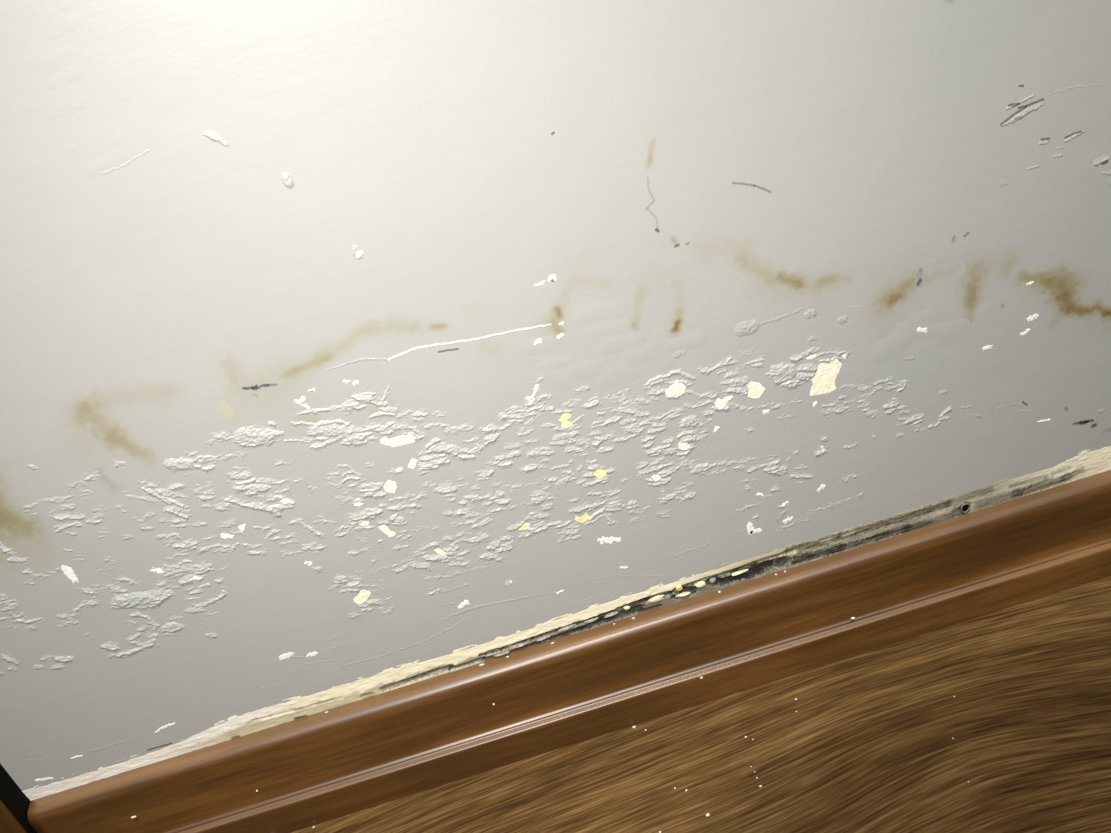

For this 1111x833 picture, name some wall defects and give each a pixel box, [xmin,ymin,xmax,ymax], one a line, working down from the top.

spalling [1000,83,1107,127]
spalling [1038,130,1085,158]
leakage [526,221,1111,353]
leakage [45,292,493,496]
leakage [0,440,103,602]
peeling [0,335,983,660]
flaking render [922,446,1111,519]
peeling [0,652,77,677]
flaking render [22,542,831,801]